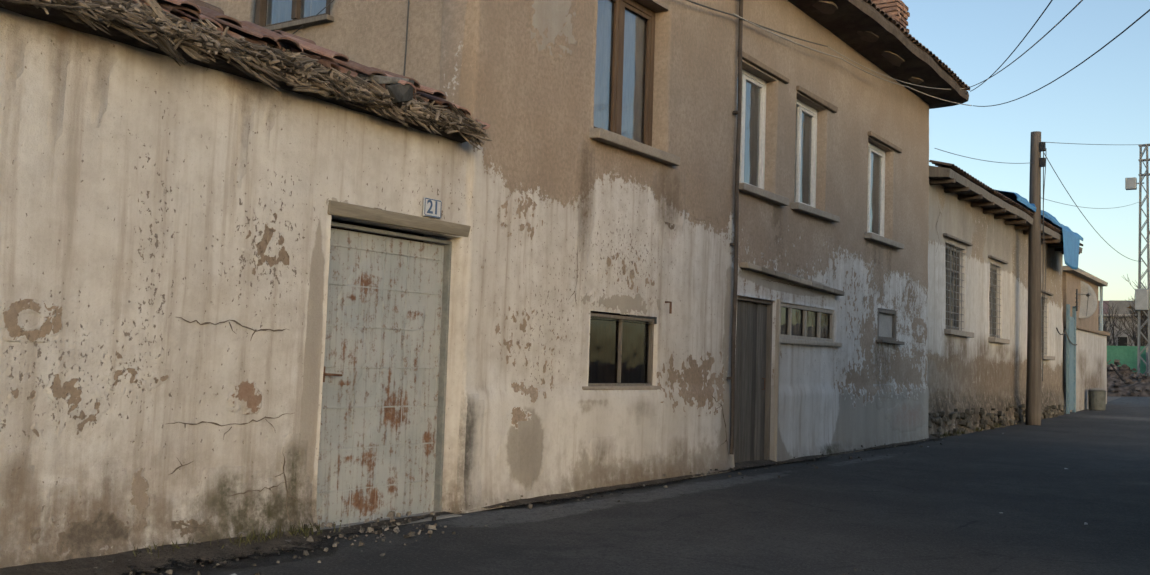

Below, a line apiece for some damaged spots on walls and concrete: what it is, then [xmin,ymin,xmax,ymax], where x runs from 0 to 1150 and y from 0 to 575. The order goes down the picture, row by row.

spalling [242,208,293,283]
spalling [500,196,544,243]
spalling [2,298,64,343]
crack [178,317,289,341]
rust [328,256,390,391]
spalling [570,246,665,317]
spalling [733,195,1026,429]
spalling [0,347,170,441]
spalling [227,379,262,415]
rust [319,304,435,522]
spalling [656,350,731,417]